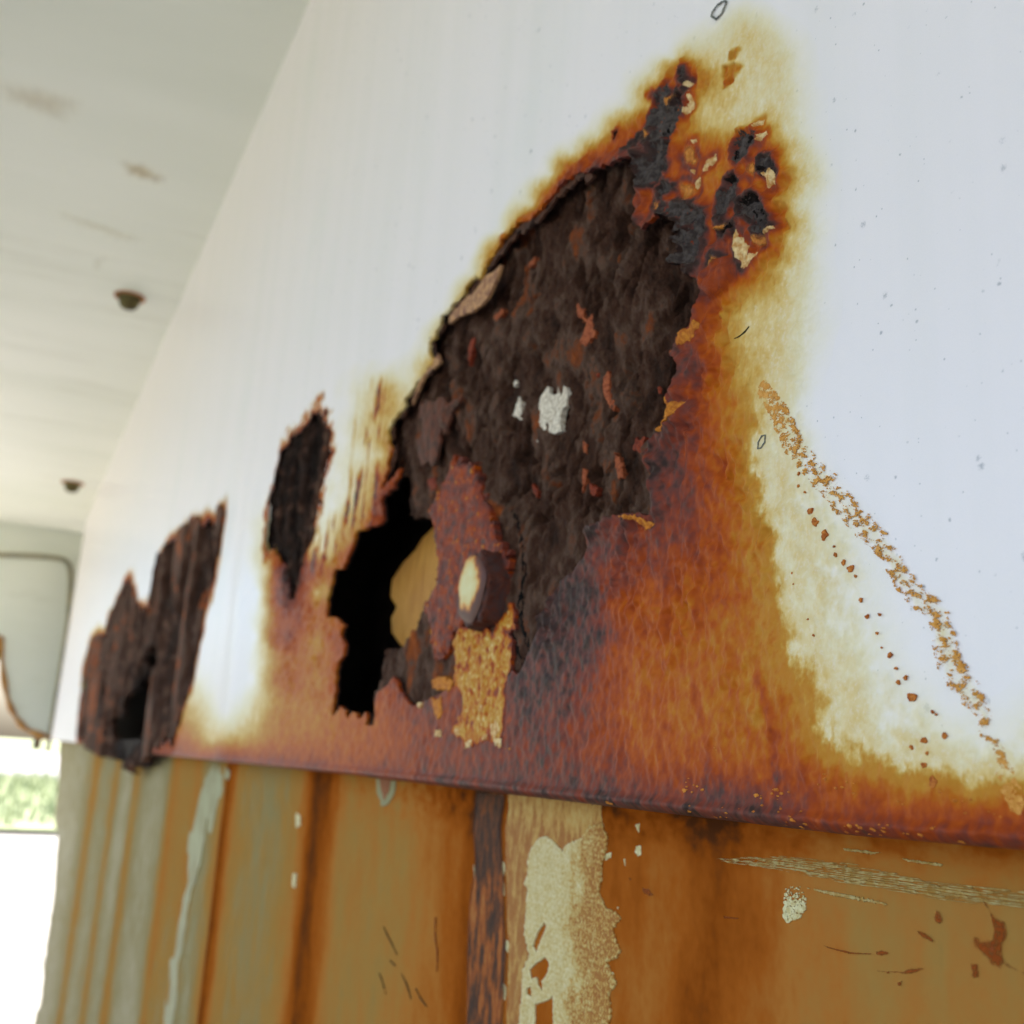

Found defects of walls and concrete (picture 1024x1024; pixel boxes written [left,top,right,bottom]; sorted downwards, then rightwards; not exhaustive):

corrosion [76,0,1024,850]
spalling [359,491,434,717]
corrosion [34,741,171,1024]
peeling [164,765,231,1024]
corrosion [135,756,309,1024]
corrosion [283,771,478,1024]
corrosion [467,790,509,1024]
corrosion [521,923,553,1024]
peeling [503,794,641,1024]
peeling [782,886,807,923]
corrosion [599,805,1024,1024]